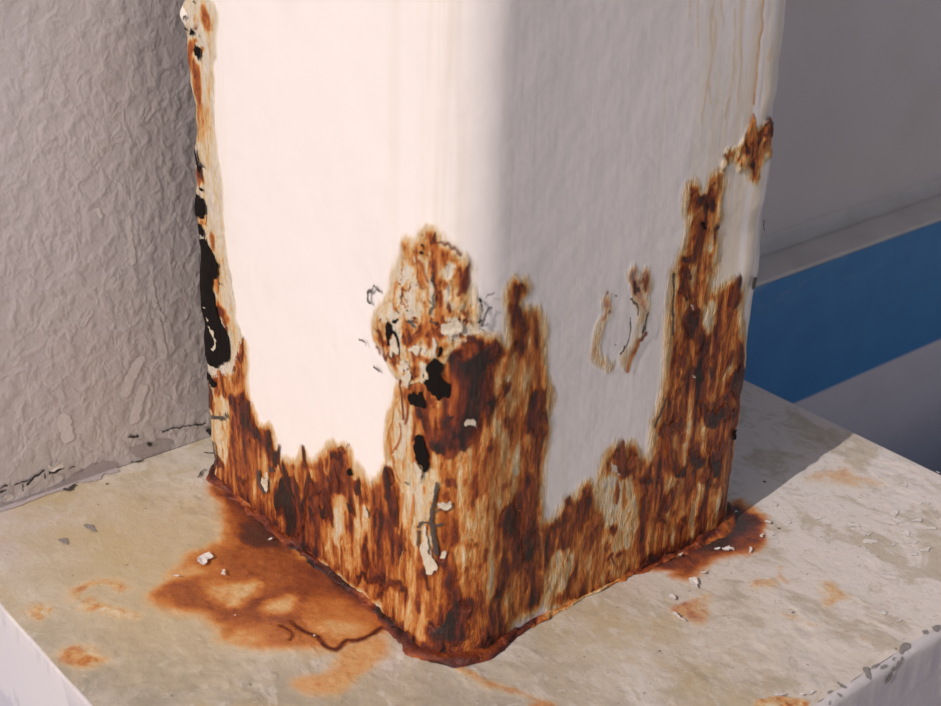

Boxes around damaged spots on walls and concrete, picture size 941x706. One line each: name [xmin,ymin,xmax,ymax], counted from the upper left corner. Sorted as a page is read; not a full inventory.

corrosion [132,0,810,706]
peeling [0,460,120,512]
spalling [863,642,911,684]